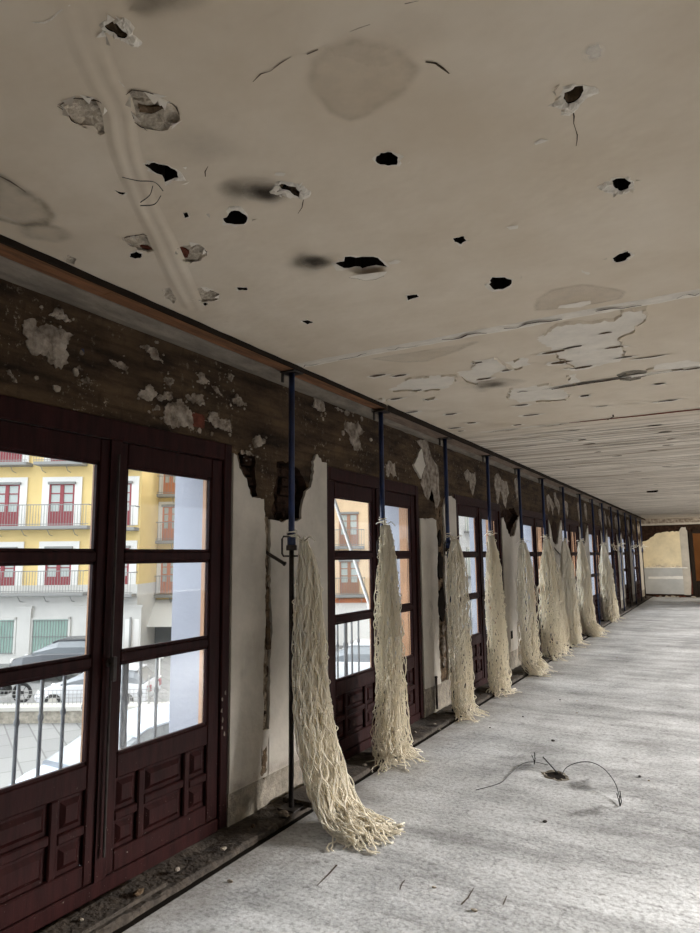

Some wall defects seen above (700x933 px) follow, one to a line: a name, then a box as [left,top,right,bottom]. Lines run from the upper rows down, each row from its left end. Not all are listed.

spalling [96,14,127,46]
crack [253,49,318,82]
spalling [57,95,107,135]
spalling [125,89,181,131]
spalling [552,86,583,102]
spalling [122,233,155,253]
spalling [175,242,209,263]
peeling [367,305,700,426]
spalling [238,445,265,497]
spalling [271,461,307,521]